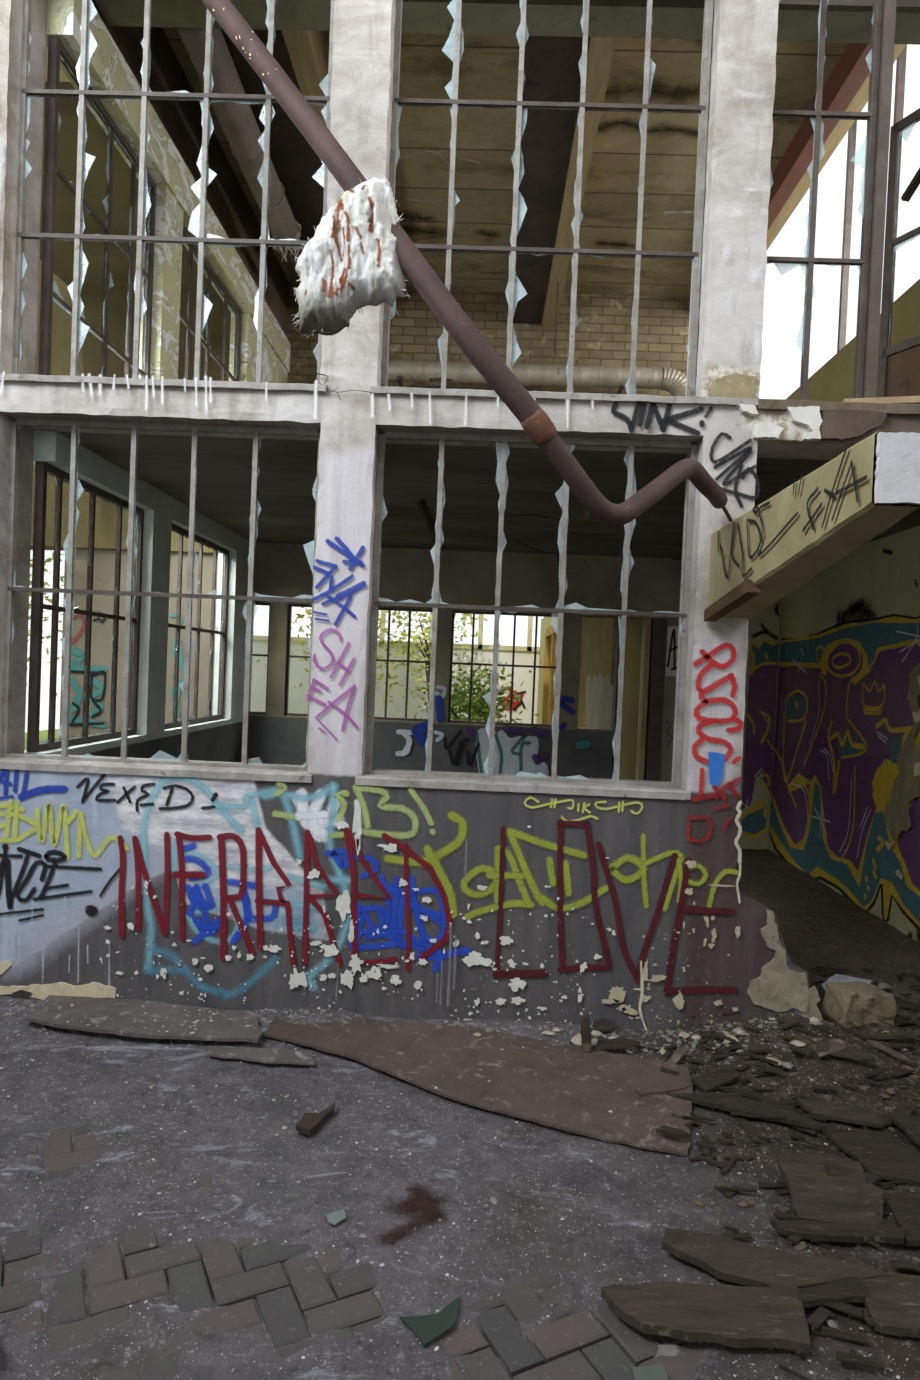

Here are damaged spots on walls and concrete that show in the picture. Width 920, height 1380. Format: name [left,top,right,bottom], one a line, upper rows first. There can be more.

peeling [708,373,823,441]
peeling [296,859,320,879]
peeling [335,800,397,856]
spalling [711,800,742,903]
peeling [0,880,428,1009]
spalling [399,878,823,1029]